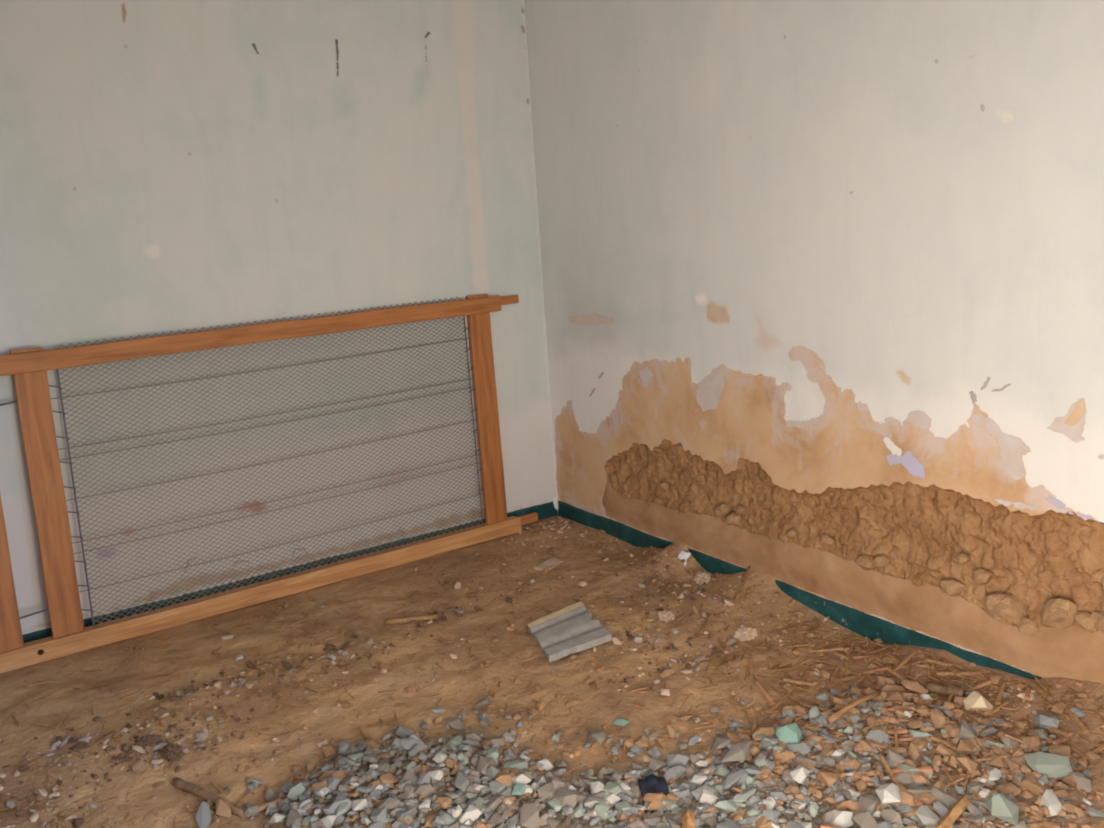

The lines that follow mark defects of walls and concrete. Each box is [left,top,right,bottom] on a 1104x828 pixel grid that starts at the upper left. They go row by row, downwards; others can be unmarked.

peeling [693,289,731,326]
peeling [507,341,1100,542]
peeling [82,505,485,619]
peeling [21,621,51,635]
peeling [777,579,1040,677]
spalling [877,676,929,694]